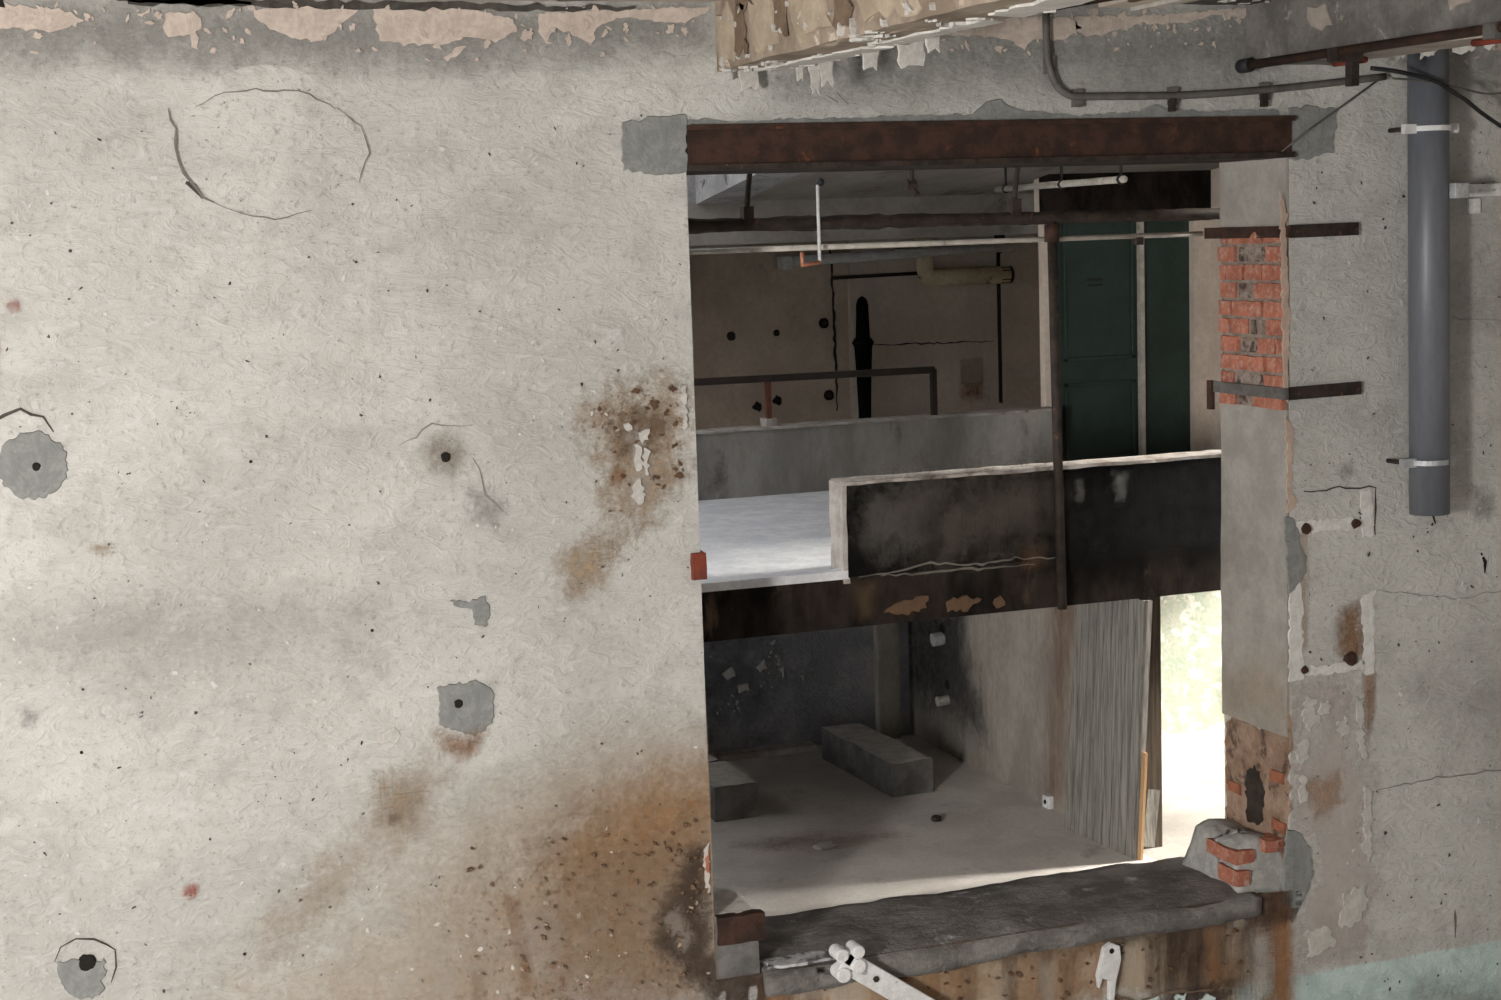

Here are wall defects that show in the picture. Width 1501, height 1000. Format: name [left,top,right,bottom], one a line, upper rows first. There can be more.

peeling [0,0,85,33]
peeling [137,8,202,50]
peeling [253,6,517,62]
peeling [538,0,1270,95]
peeling [1363,36,1496,63]
crack [168,88,370,220]
rust [581,370,689,528]
rust [446,737,479,753]
rust [456,782,889,1000]
rust [862,921,1086,958]
rust [897,890,1290,1000]
peeling [1114,978,1227,1000]